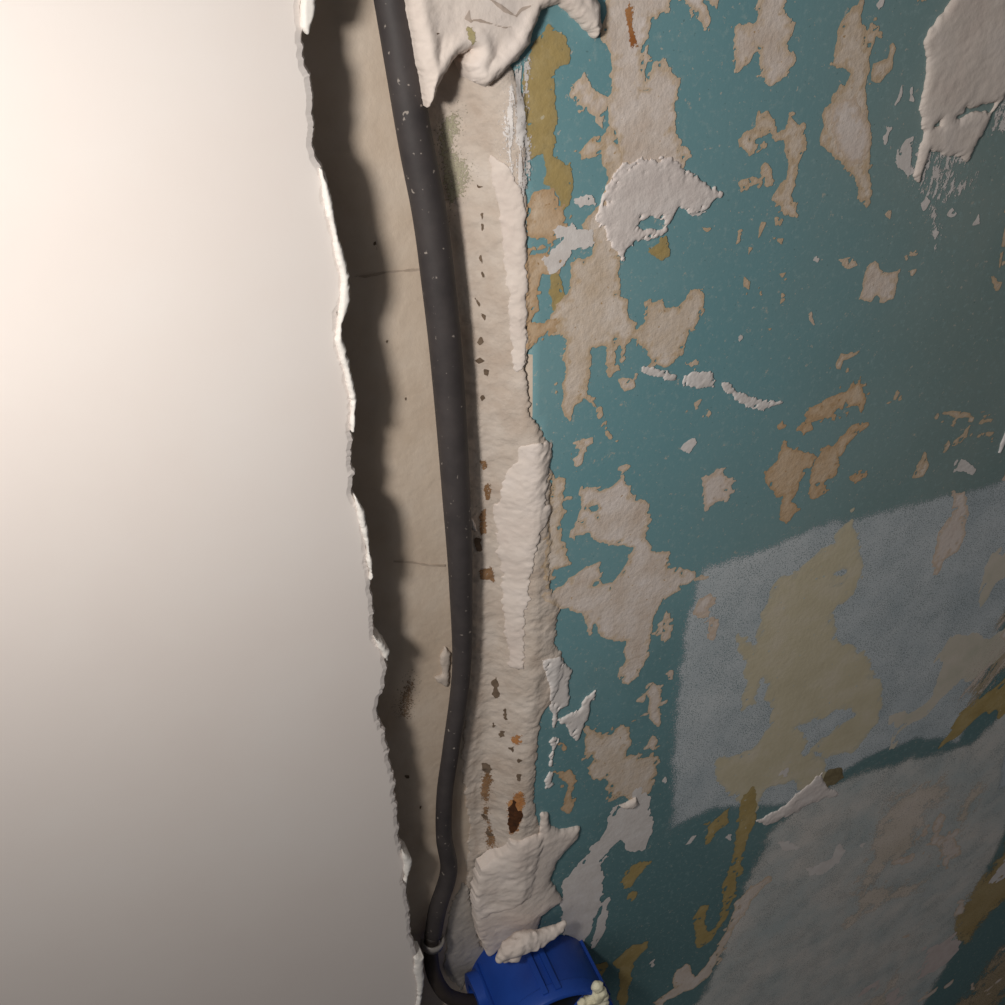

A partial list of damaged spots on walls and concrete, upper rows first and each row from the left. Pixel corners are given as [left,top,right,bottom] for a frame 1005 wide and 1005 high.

peeling [820,0,896,208]
peeling [736,111,807,255]
peeling [839,250,918,303]
peeling [764,351,870,524]
peeling [934,411,994,453]
rust [479,483,492,535]
peeling [932,490,969,576]
rust [479,568,495,583]
peeling [653,508,1005,1005]
rust [480,772,496,849]
rust [506,791,526,834]
peeling [596,941,648,1005]